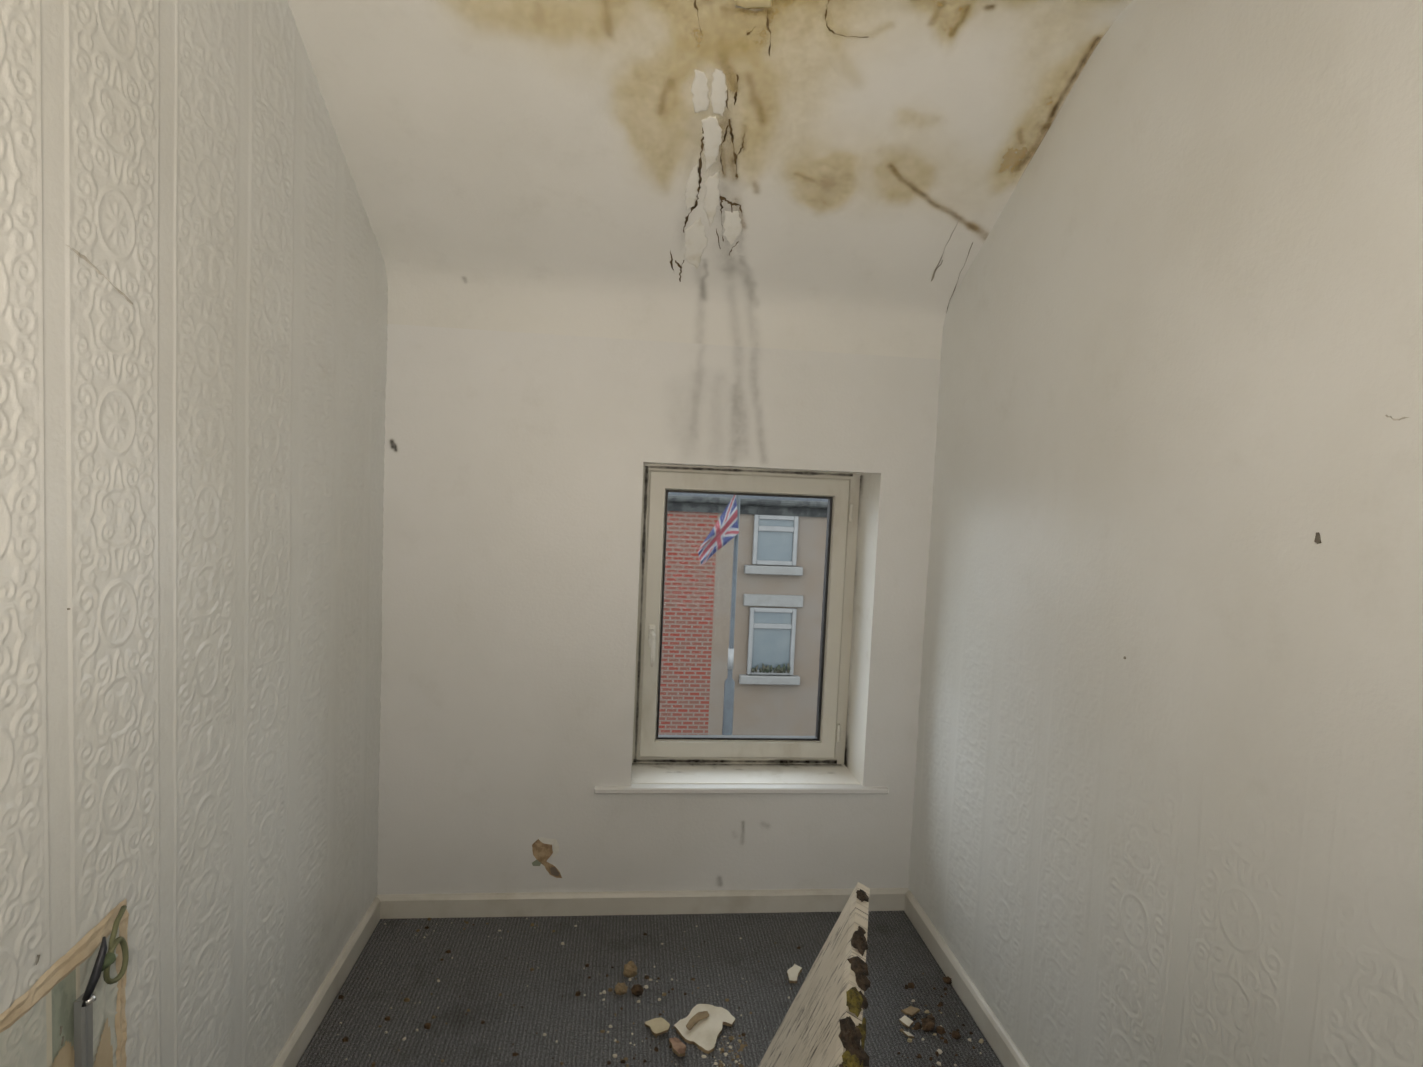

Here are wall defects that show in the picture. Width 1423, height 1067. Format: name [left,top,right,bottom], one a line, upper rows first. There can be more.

crack [746,10,771,56]
crack [670,75,745,282]
spalling [532,837,562,878]